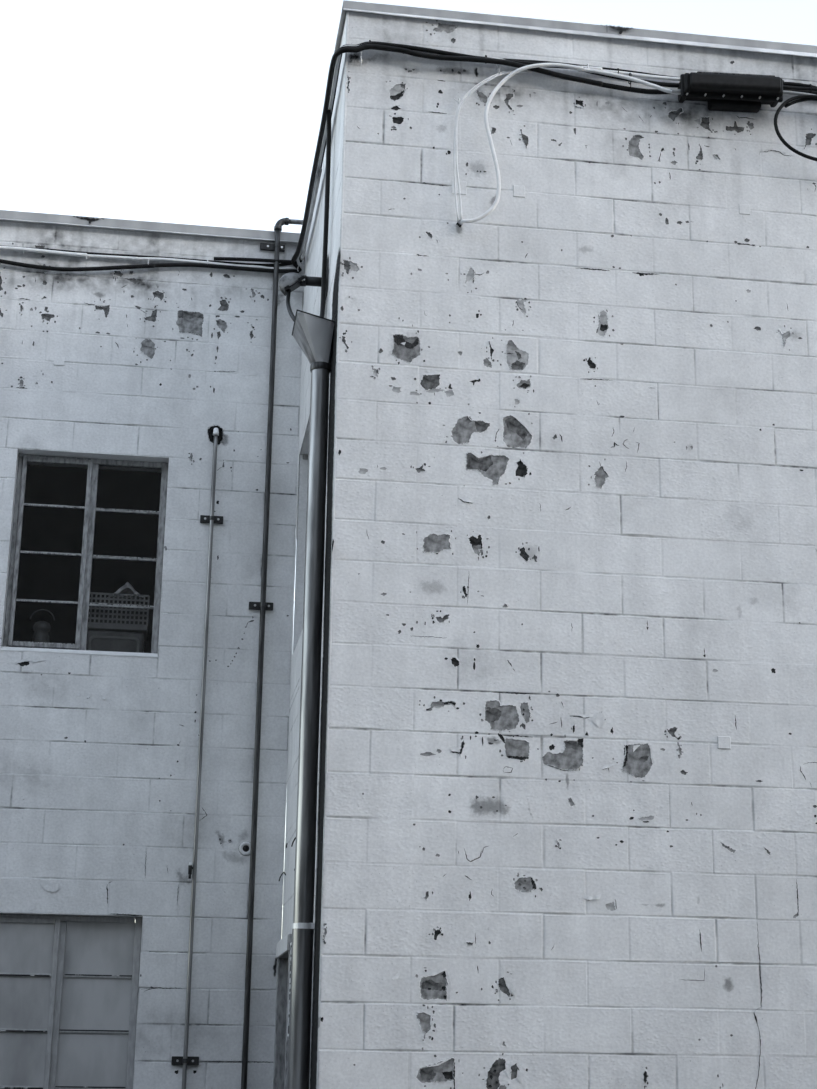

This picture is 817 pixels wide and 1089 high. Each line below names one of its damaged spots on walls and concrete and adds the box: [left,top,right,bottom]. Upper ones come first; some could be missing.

peeling [113,270,257,364]
peeling [516,298,531,317]
peeling [367,317,454,405]
peeling [443,329,534,486]
peeling [402,530,490,560]
peeling [419,695,613,782]
peeling [613,727,688,782]
peeling [415,967,463,1089]
peeling [481,968,517,1001]
peeling [479,1053,528,1089]